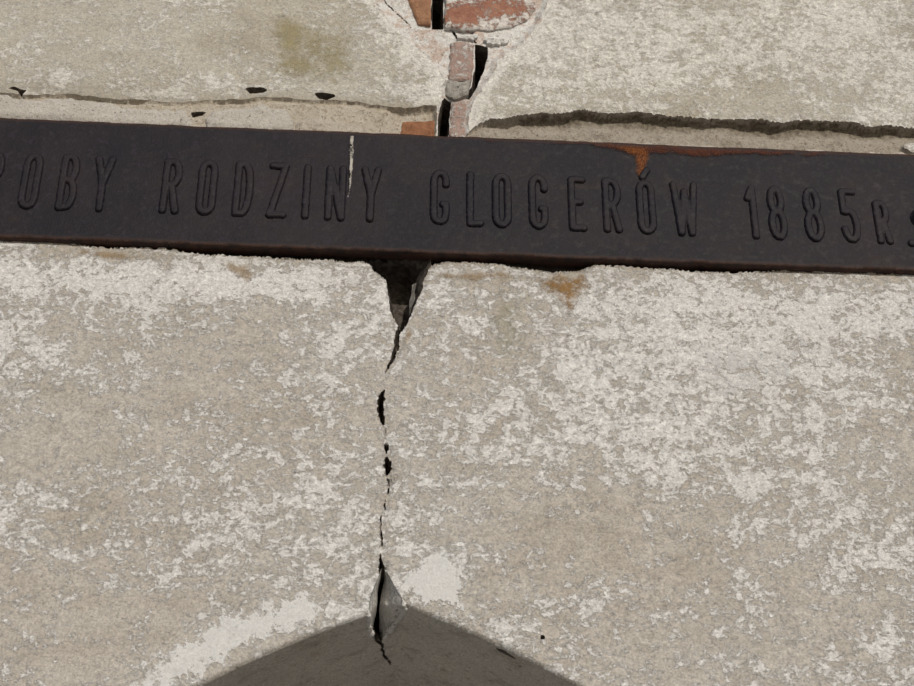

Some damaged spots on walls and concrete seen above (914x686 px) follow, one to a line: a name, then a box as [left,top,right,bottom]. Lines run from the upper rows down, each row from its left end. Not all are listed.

crack [384,0,488,137]
spalling [0,0,914,155]
corrosion [592,143,788,172]
crack [377,327,401,583]
crack [374,626,392,665]